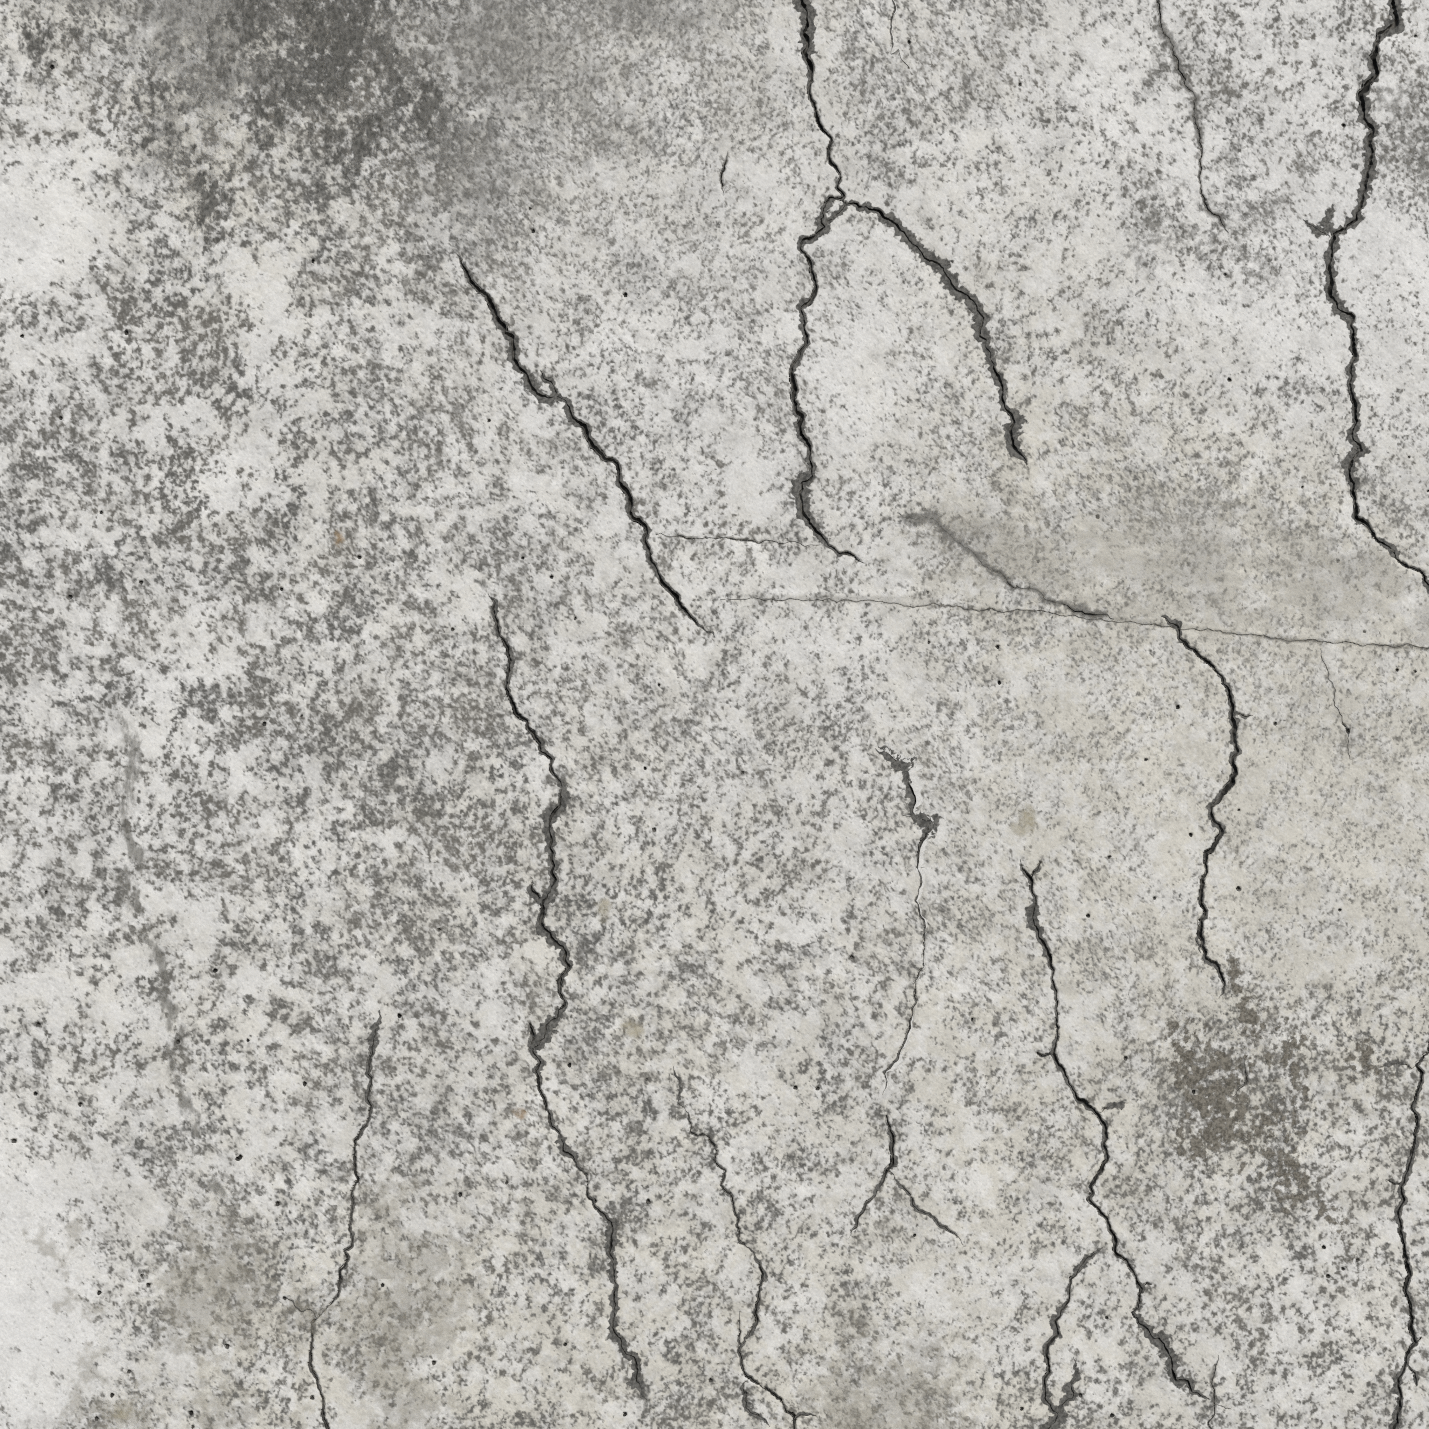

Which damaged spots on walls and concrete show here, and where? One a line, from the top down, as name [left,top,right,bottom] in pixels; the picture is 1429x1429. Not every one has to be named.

crack [457,254,715,637]
crack [789,0,1028,563]
crack [901,512,1109,618]
crack [1156,0,1229,233]
crack [1303,0,1429,594]
crack [291,1010,382,1429]
crack [488,594,645,1399]
crack [673,1066,816,1429]
crack [850,745,957,1236]
crack [1020,859,1231,1429]
crack [1162,615,1250,997]
crack [1381,1048,1429,1429]